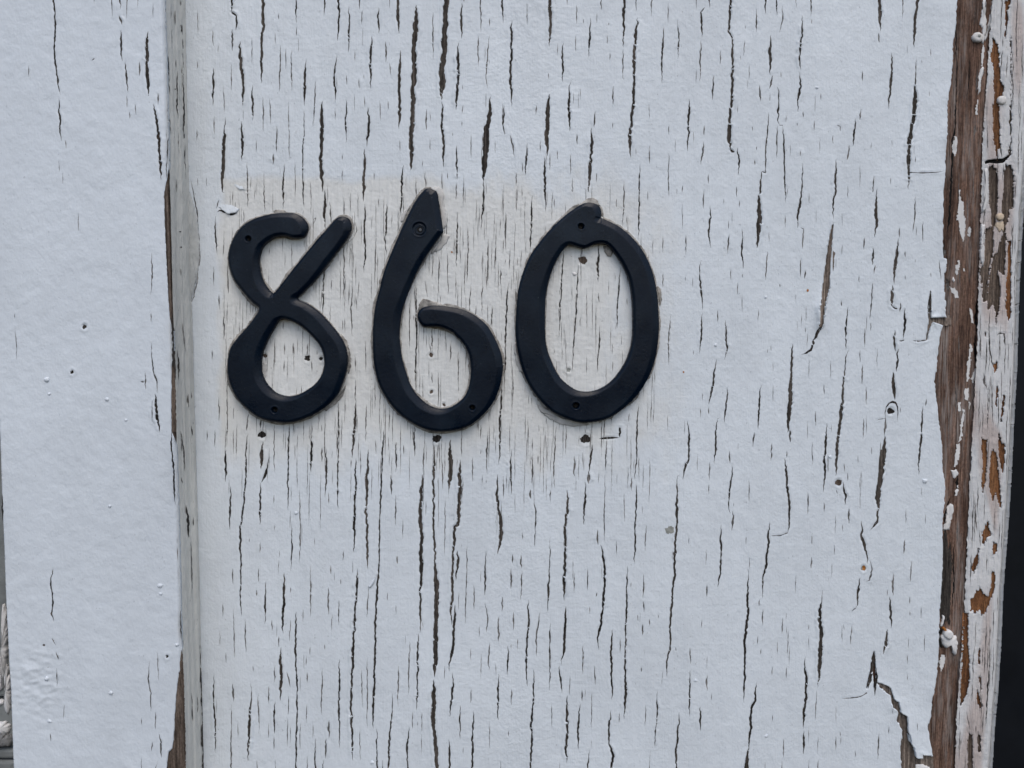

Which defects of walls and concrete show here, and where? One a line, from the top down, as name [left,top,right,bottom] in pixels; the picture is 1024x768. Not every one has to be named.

peeling [957,0,1014,322]
peeling [946,260,965,298]
peeling [926,311,952,340]
crack [111,0,872,768]
crack [743,0,1024,768]
peeling [943,344,976,530]
peeling [981,439,1005,507]
peeling [971,521,997,571]
peeling [960,572,995,708]
peeling [877,682,934,768]
peeling [967,734,981,768]